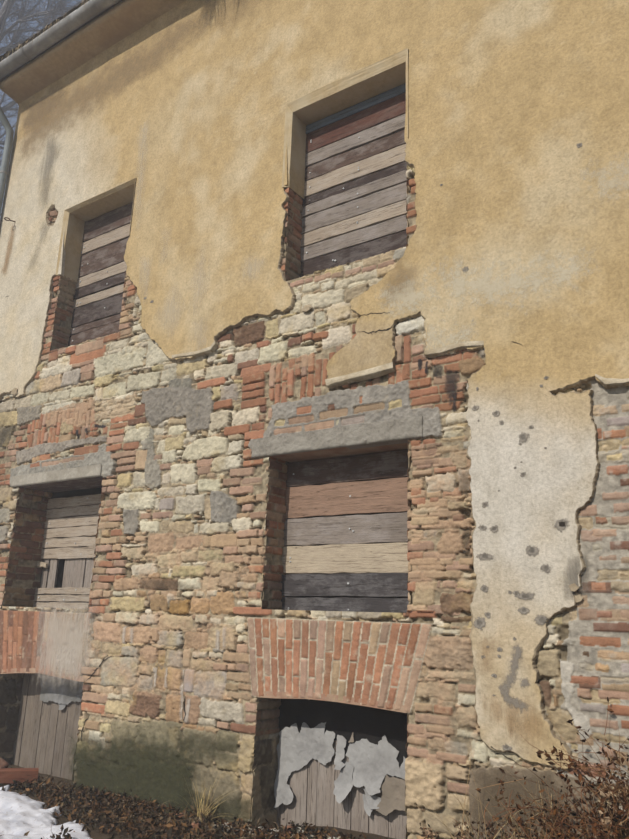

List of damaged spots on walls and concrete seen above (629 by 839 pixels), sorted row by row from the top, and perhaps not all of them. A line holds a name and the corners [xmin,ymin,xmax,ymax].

spalling [0,152,486,413]
crack [360,311,396,334]
spalling [480,376,629,777]
peeling [39,675,83,710]
water stain [499,645,529,713]
peeling [274,722,406,817]